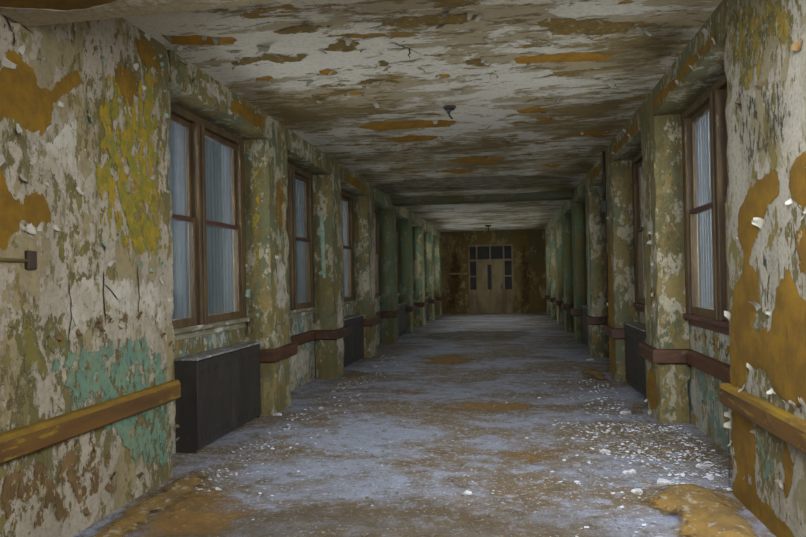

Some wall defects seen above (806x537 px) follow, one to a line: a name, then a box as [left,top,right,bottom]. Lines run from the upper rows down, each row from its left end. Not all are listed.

spalling [0,0,125,12]
peeling [162,35,264,130]
peeling [232,46,308,70]
peeling [318,37,367,54]
peeling [507,52,613,66]
peeling [537,17,652,40]
peeling [359,120,456,142]
peeling [0,32,176,410]
peeling [245,155,289,309]
peeling [694,151,806,413]
peeling [1,402,180,529]
peeling [724,409,794,537]